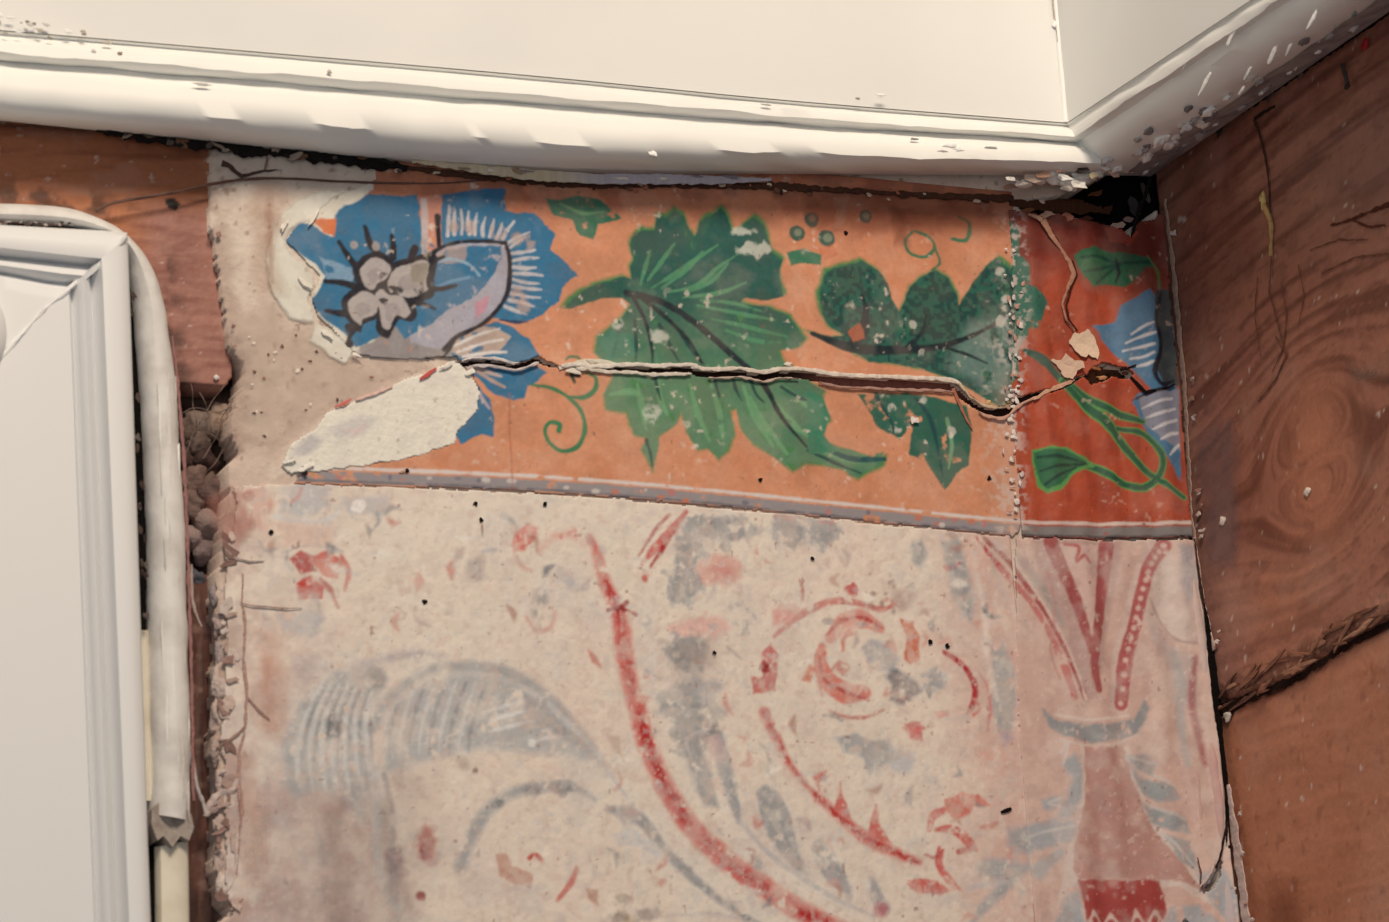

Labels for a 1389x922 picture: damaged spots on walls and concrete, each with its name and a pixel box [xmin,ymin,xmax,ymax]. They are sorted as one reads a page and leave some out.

peeling [1003,9,1359,228]
peeling [266,190,362,363]
peeling [282,361,480,476]
crack [458,356,1082,430]
crack [1119,364,1175,394]
spalling [171,336,243,922]